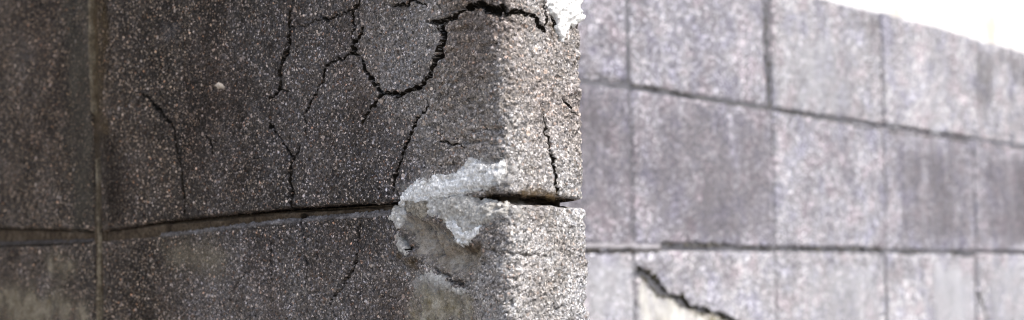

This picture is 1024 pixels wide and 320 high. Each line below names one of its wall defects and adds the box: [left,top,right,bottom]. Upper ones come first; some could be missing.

crack [142,94,186,214]
crack [268,0,560,284]
crack [540,98,579,195]
crack [637,266,736,320]